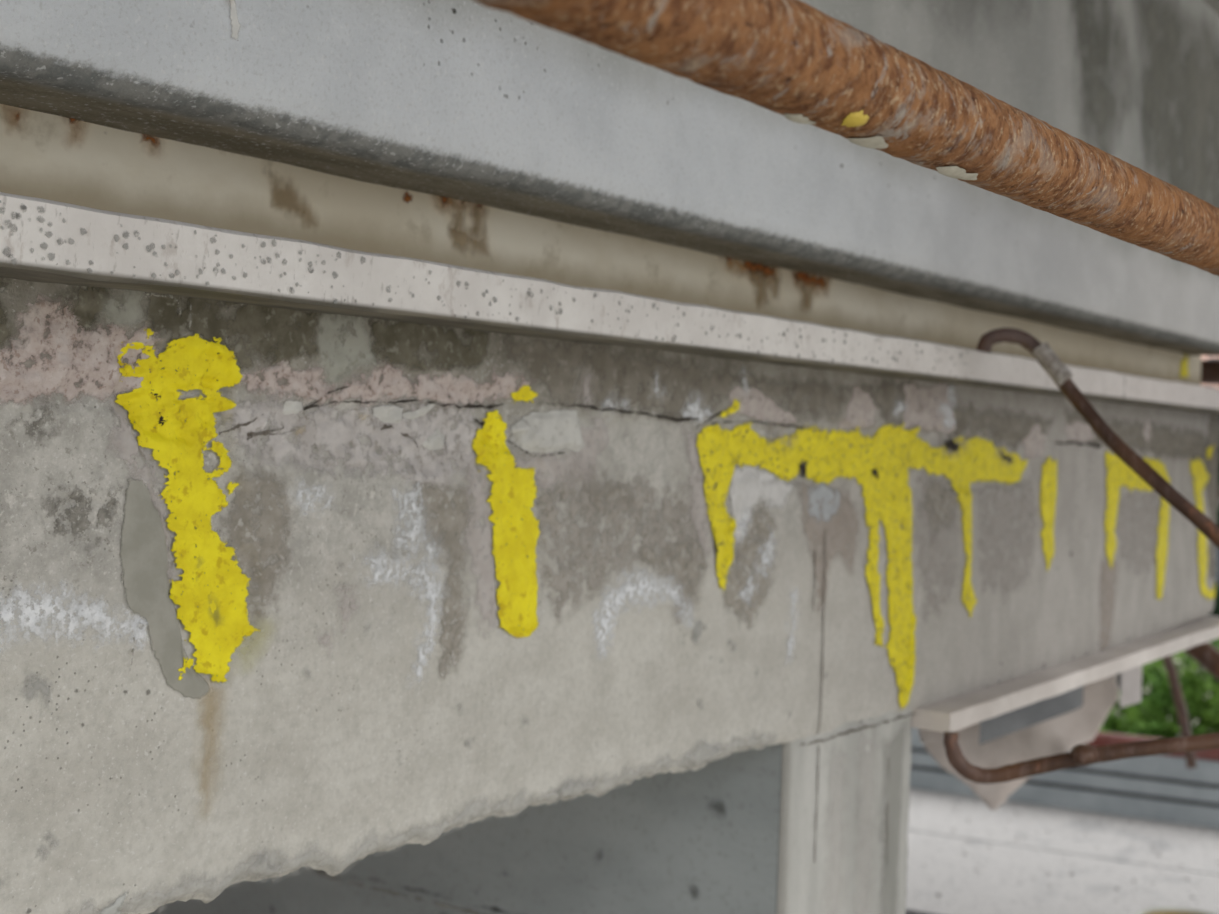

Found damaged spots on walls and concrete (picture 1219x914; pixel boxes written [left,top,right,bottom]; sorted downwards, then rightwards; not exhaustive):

corrosion [726,257,777,306]
corrosion [795,272,830,308]
spalling [0,294,163,404]
crack [546,403,804,430]
efflorescence [0,590,145,641]
crack [801,529,918,864]
spalling [81,734,775,914]